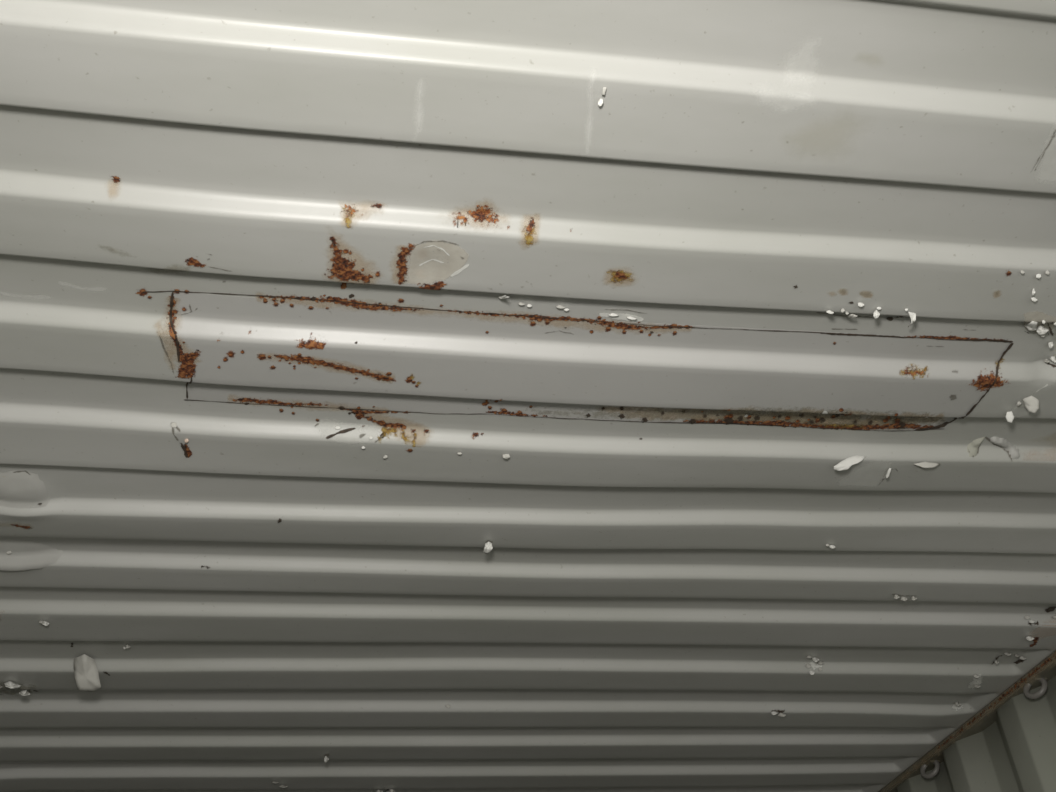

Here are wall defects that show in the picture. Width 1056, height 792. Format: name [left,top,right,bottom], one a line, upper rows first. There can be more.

rust [341,203,382,228]
rust [453,205,509,228]
rust [525,217,535,245]
rust [325,237,380,289]
rust [396,243,447,290]
peeling [1024,320,1056,337]
rust [258,339,420,388]
crack [136,288,1014,458]
peeling [1006,384,1048,423]
rust [353,410,430,453]
peeling [834,455,866,471]
peeling [70,643,110,692]